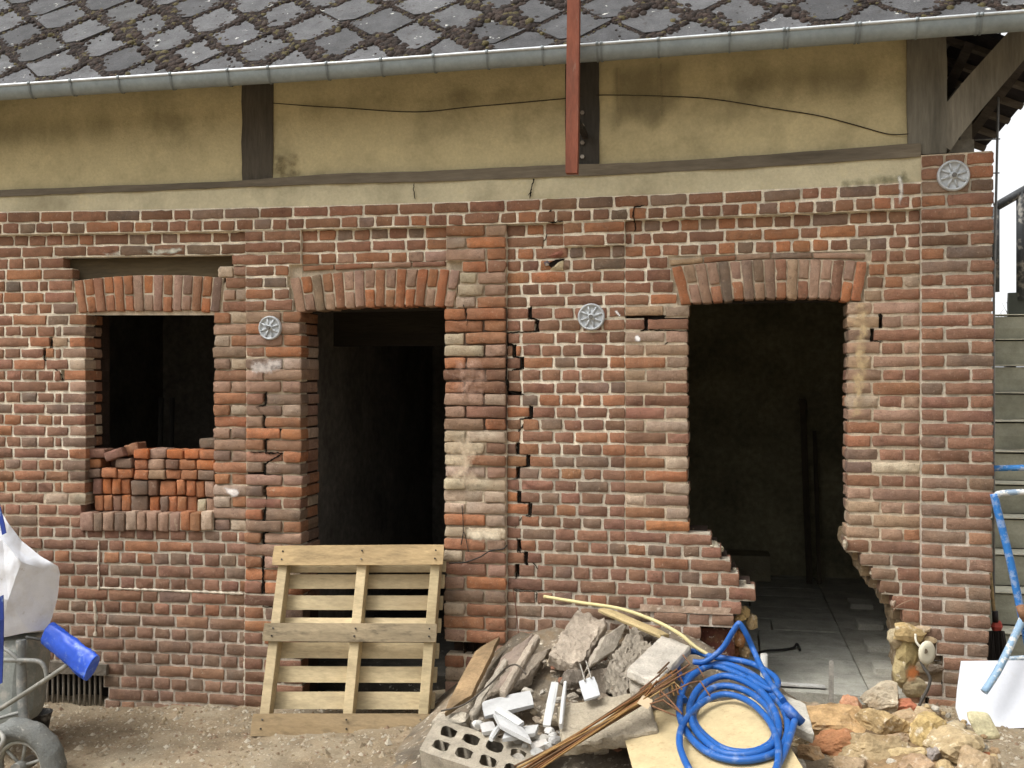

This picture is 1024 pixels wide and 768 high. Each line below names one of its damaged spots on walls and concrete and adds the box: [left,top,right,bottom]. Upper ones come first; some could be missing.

crack [505,306,543,601]
spalling [640,604,758,666]
spalling [837,526,944,703]